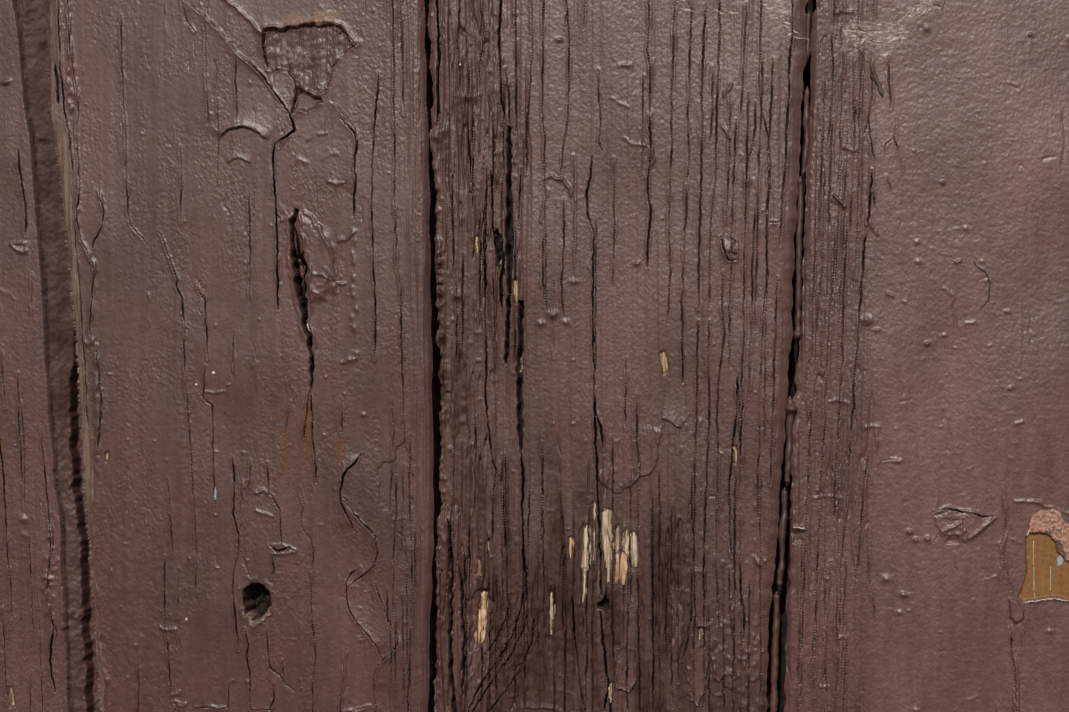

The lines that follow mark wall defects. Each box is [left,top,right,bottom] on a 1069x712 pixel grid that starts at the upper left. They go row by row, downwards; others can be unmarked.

peeling [263,14,356,93]
crack [58,1,416,712]
crack [436,0,793,712]
peeling [472,591,491,643]
peeling [524,420,682,602]
peeling [1018,509,1069,603]